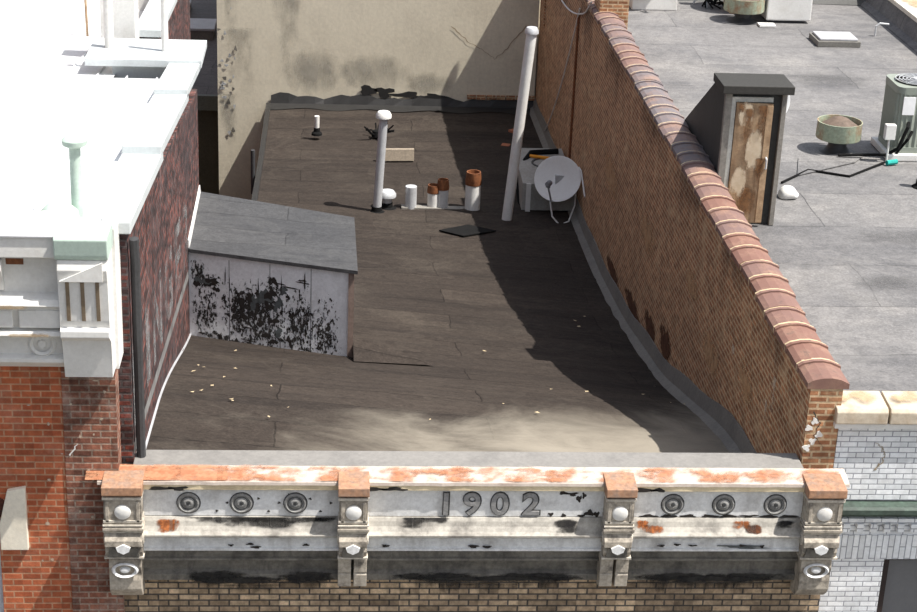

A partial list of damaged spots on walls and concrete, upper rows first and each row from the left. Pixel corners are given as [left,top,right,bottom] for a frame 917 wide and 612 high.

peeling [191,260,338,355]
peeling [85,471,104,480]
peeling [119,464,301,491]
peeling [314,466,364,481]
peeling [370,467,588,503]
peeling [638,468,675,492]
peeling [693,469,789,483]
rust [637,520,663,533]
rust [733,521,762,534]